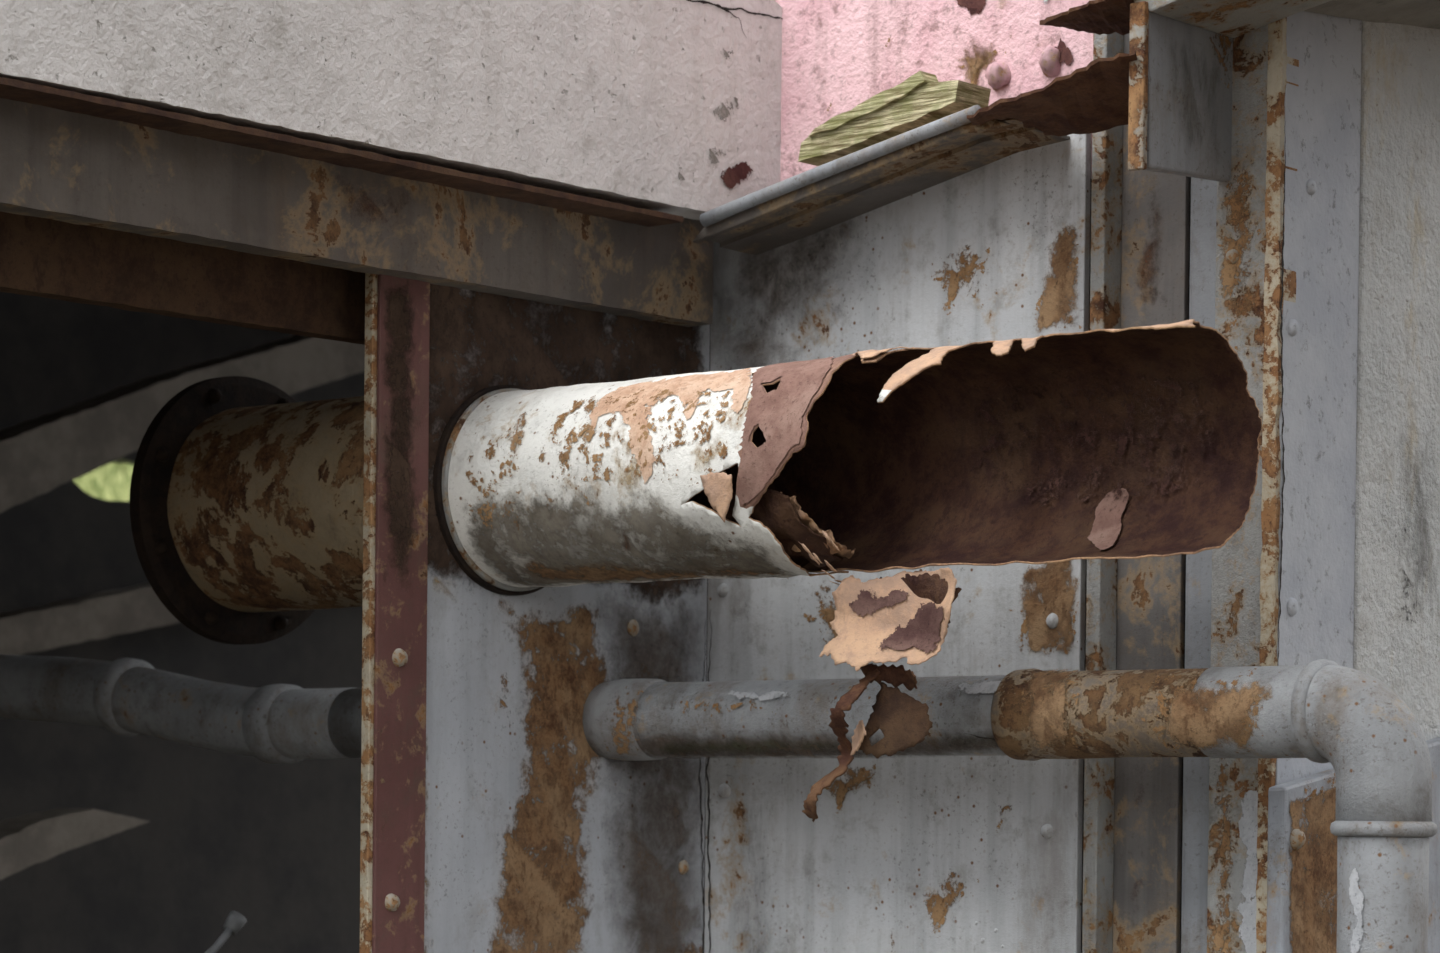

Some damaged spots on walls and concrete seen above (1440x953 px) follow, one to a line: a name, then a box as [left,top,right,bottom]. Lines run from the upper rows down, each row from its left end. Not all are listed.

crack [687,0,783,37]
peeling [957,0,986,15]
rust [854,347,912,359]
rust [931,245,998,316]
rust [1035,227,1081,331]
rust [1217,163,1261,350]
rust [1009,560,1100,750]
rust [490,600,644,953]
rust [1141,668,1288,953]
rust [1289,773,1337,953]